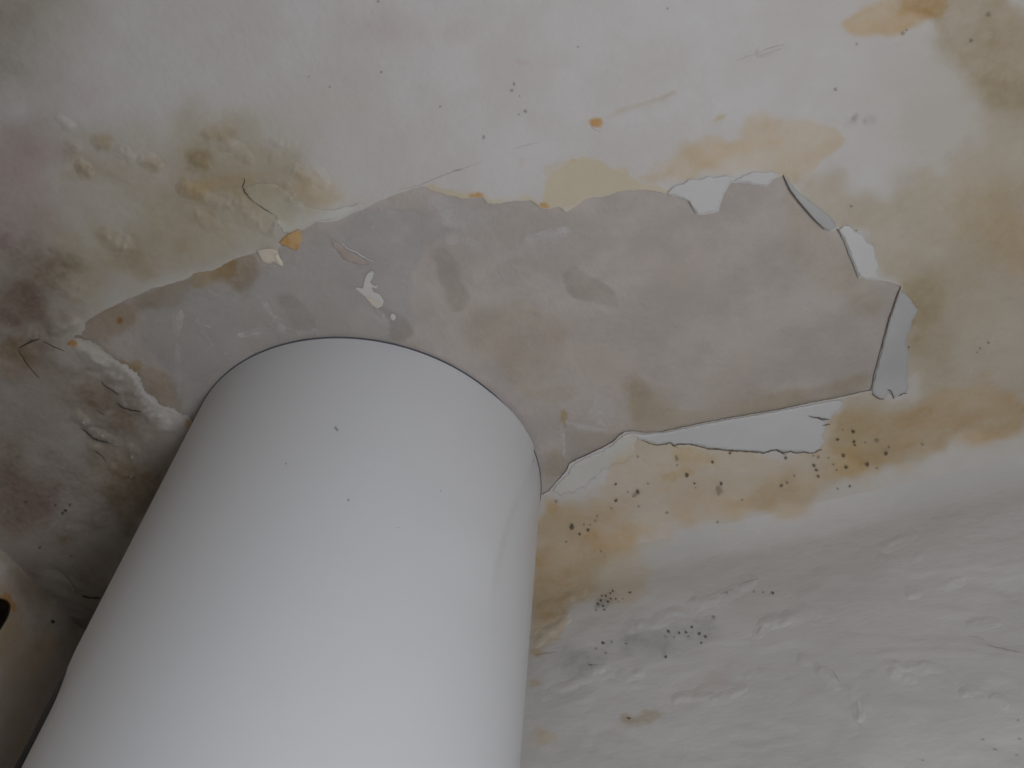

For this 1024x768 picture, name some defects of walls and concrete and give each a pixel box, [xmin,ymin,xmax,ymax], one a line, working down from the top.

crack [19,339,64,378]
peeling [73,175,901,495]